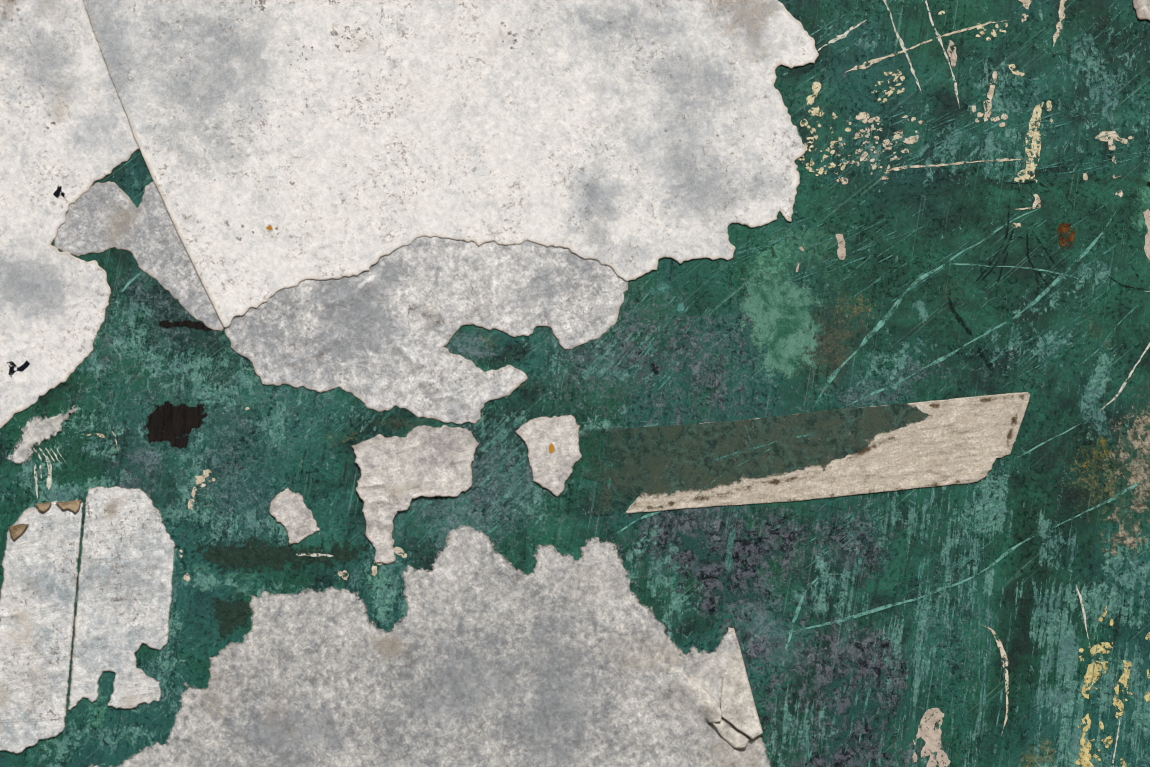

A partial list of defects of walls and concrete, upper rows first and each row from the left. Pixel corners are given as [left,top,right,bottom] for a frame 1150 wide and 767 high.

peeling [872,70,905,103]
peeling [971,64,1025,127]
peeling [798,82,923,184]
peeling [1014,100,1053,207]
peeling [1095,131,1133,197]
rust [1057,222,1075,250]
peeling [188,469,215,509]
peeling [800,635,911,767]
peeling [1079,642,1113,699]
peeling [1113,660,1150,718]
peeling [912,708,951,767]
peeling [1075,714,1113,767]